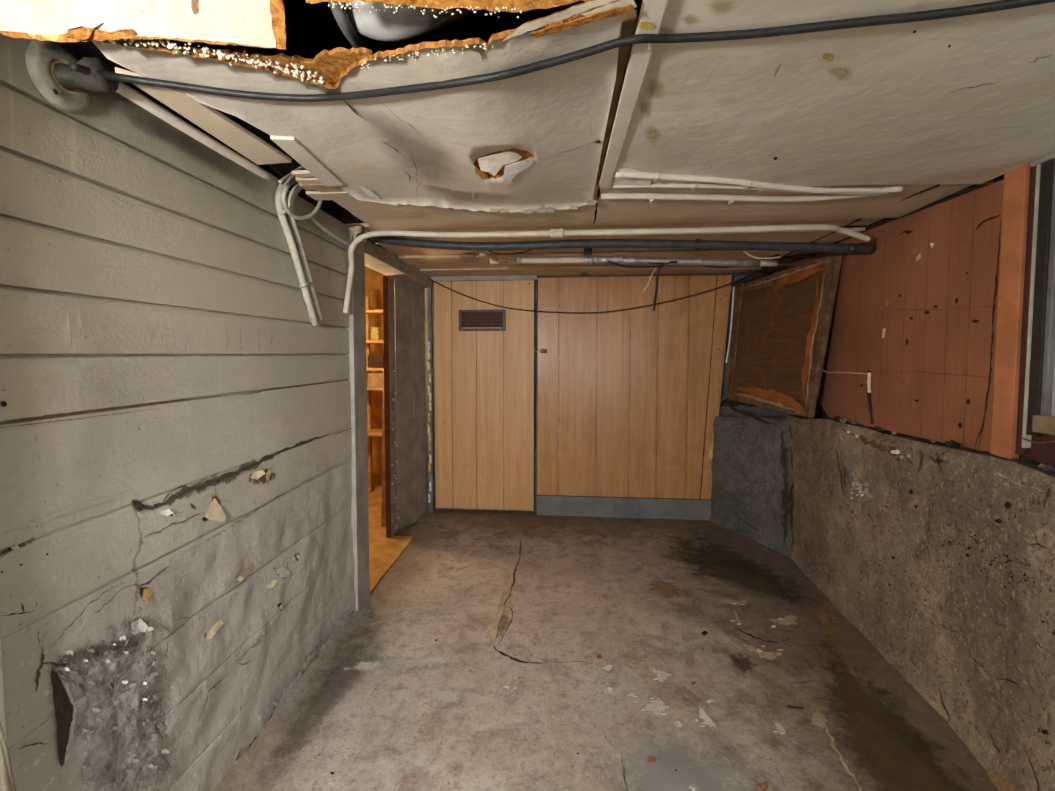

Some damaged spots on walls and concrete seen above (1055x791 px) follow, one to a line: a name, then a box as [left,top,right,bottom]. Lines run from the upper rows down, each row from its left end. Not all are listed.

flaking render [35,582,170,791]
crack [1,428,351,661]
crack [485,541,601,666]